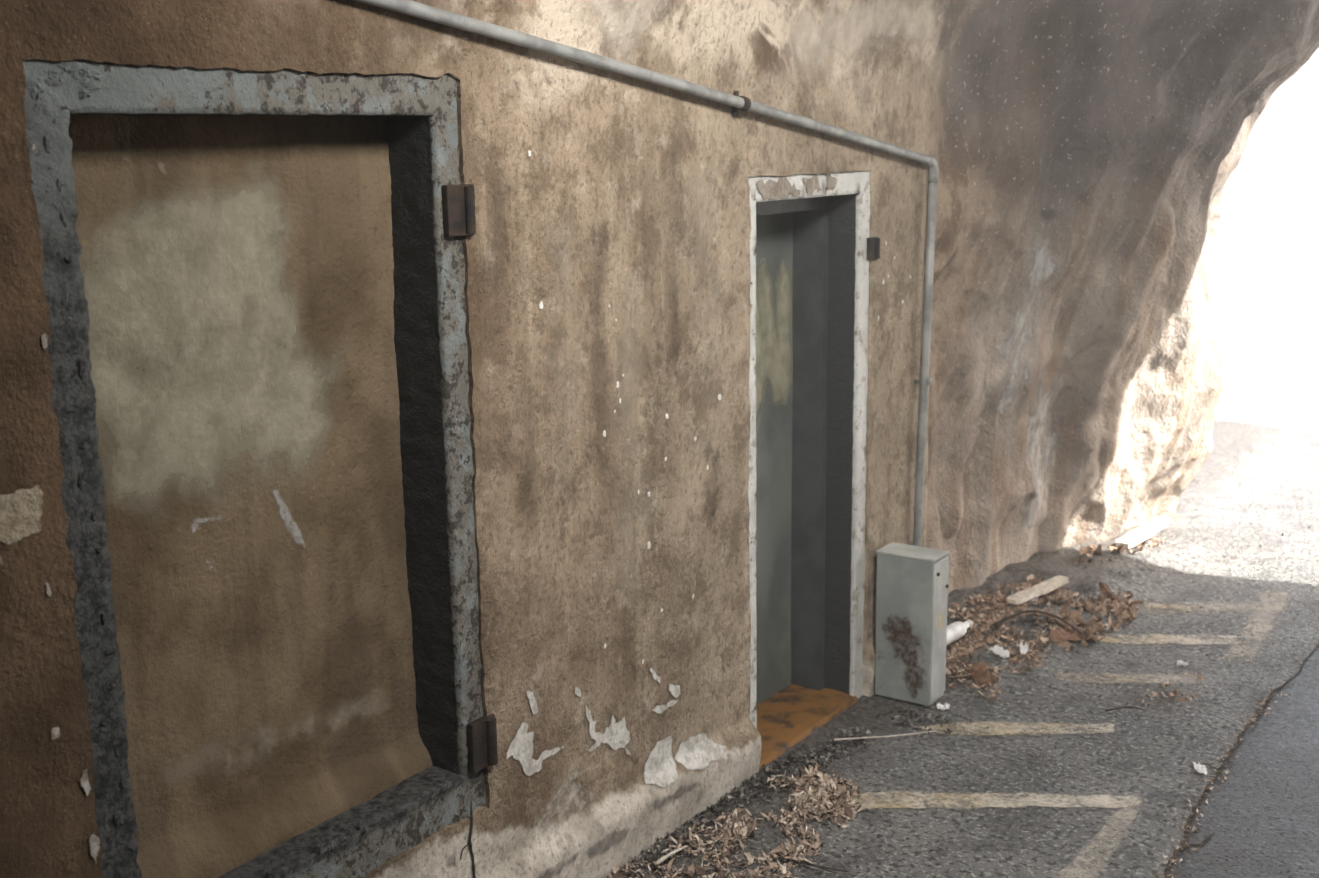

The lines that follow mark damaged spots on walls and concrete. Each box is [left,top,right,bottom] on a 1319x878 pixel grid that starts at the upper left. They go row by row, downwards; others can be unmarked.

peeling [0,484,44,565]
peeling [51,727,61,740]
peeling [506,690,565,776]
peeling [575,686,631,756]
peeling [650,667,681,714]
peeling [643,733,726,788]
crack [460,801,476,878]